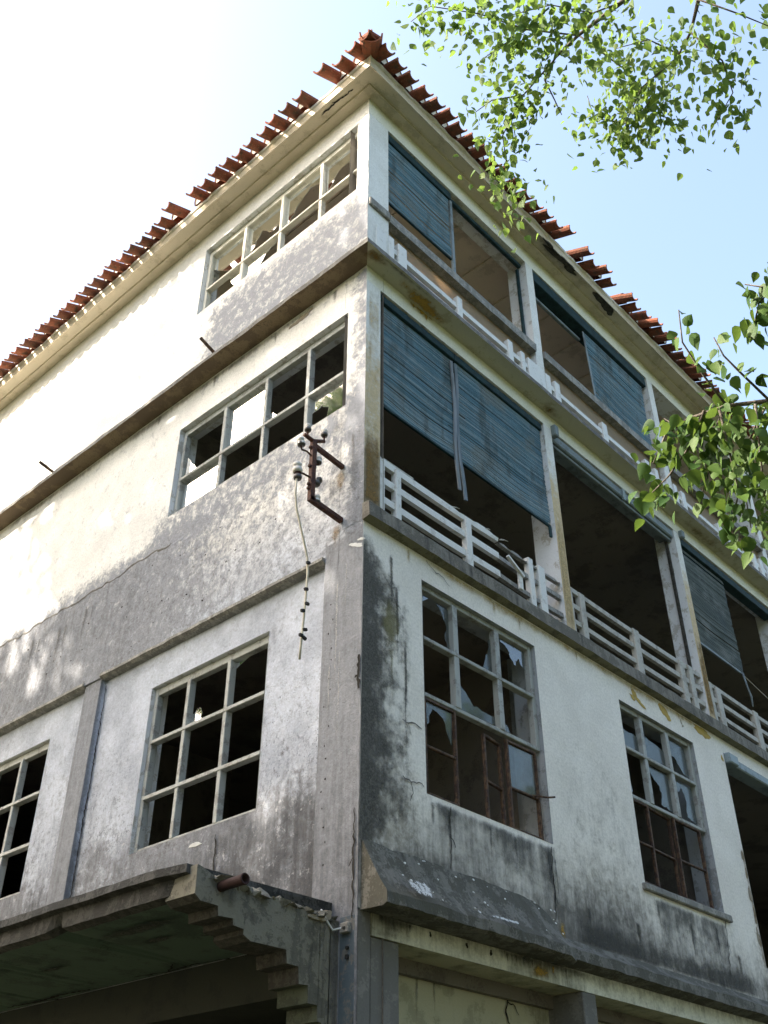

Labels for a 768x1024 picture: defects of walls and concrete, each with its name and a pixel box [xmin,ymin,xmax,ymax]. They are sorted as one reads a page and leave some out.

damp [359,541,408,842]
peeling [402,860,444,901]
crack [448,808,456,869]
damp [583,902,756,995]